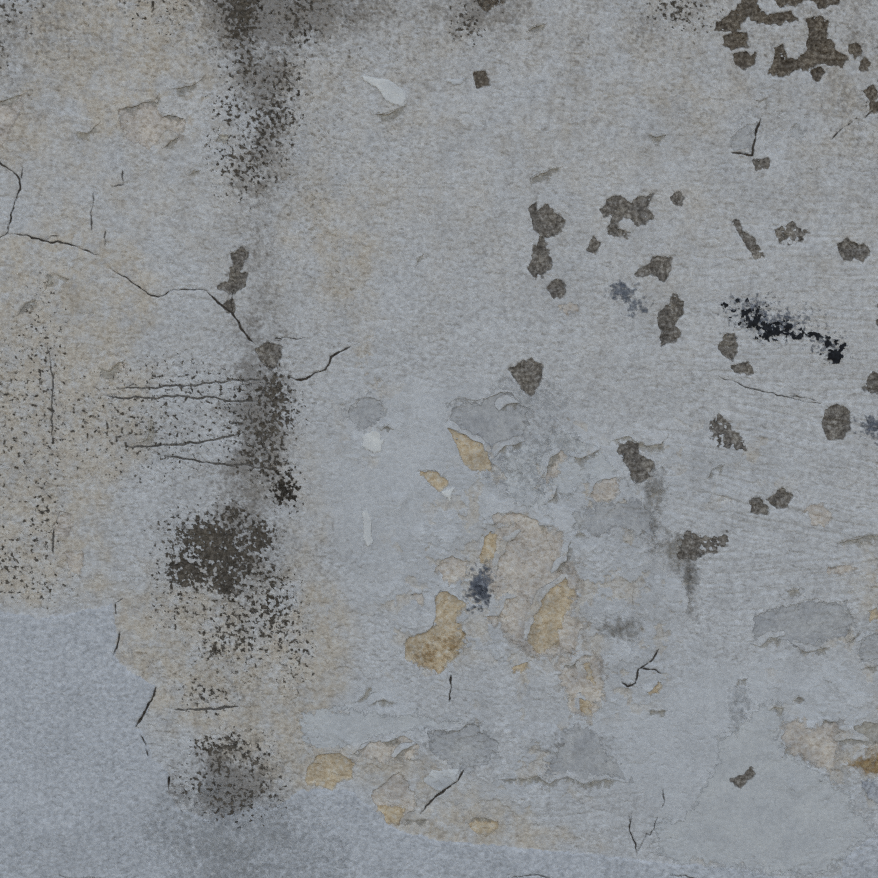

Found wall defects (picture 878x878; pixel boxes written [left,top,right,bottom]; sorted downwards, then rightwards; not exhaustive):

spalling [714,0,871,81]
crack [0,162,106,253]
spalling [527,202,579,315]
spalling [586,193,654,253]
crack [113,270,253,342]
crack [288,347,349,381]
spalling [657,293,684,345]
water stain [0,282,307,609]
crack [109,378,271,468]
peeling [439,358,669,725]
water stain [149,495,316,718]
water stain [171,726,291,860]